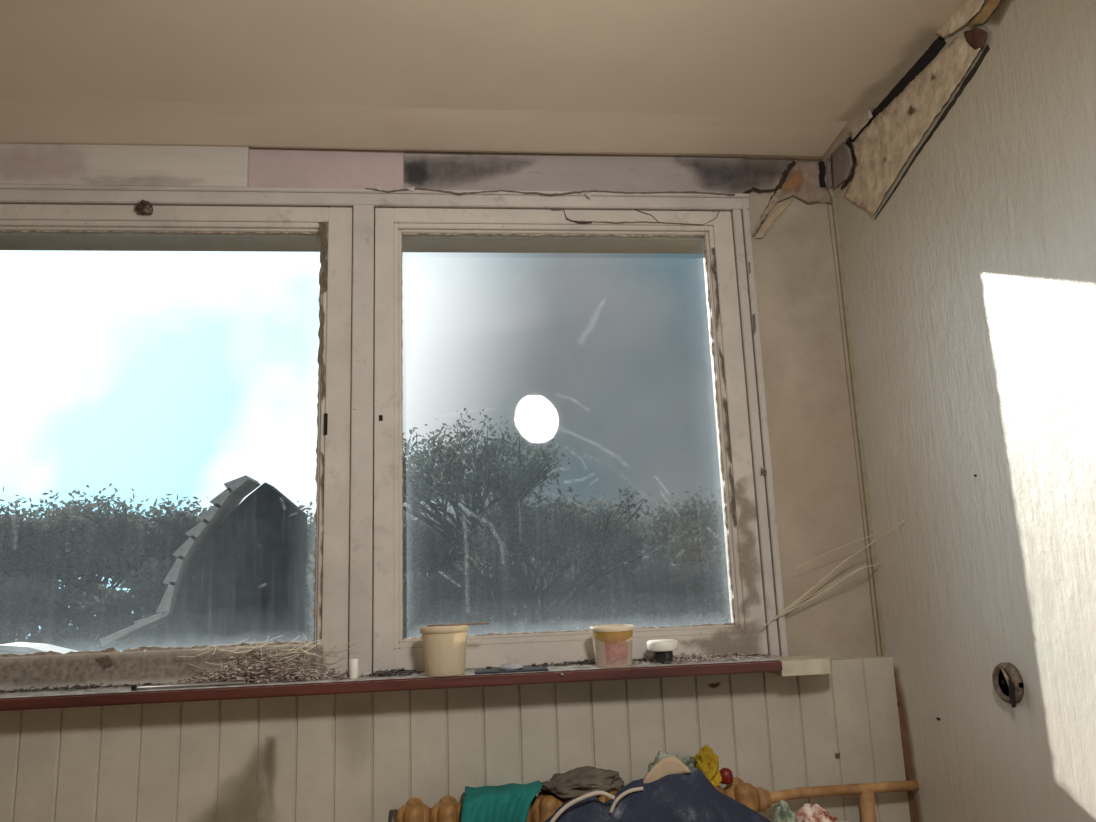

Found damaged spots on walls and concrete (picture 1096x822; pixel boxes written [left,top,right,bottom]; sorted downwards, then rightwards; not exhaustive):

flaking render [826,0,1010,190]
water stain [409,162,499,181]
crack [365,169,790,225]
water stain [208,755,264,822]